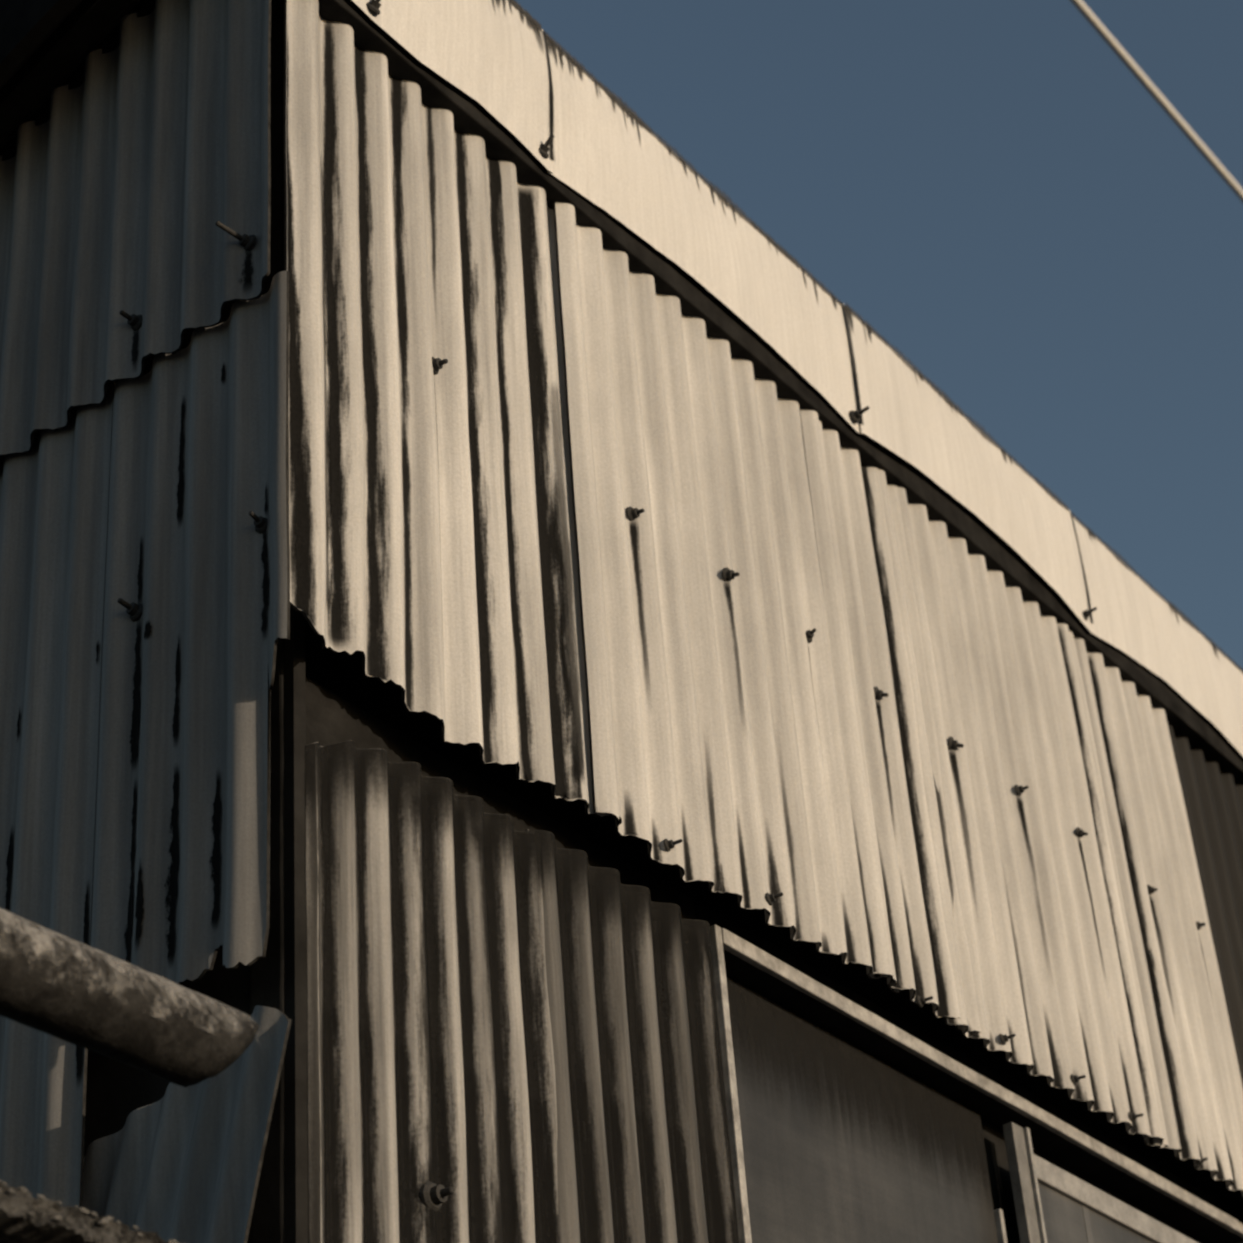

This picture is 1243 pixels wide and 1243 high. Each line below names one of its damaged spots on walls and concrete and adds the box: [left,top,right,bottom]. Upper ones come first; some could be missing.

rust [287,17,349,644]
rust [355,774,379,1243]
rust [355,46,388,680]
rust [391,77,414,711]
rust [389,792,558,1243]
rust [456,131,496,763]
rust [489,158,534,781]
rust [518,189,584,799]
rust [555,863,739,1243]
rust [492,0,1243,674]
rust [861,465,995,1050]
rust [1008,629,1155,1145]